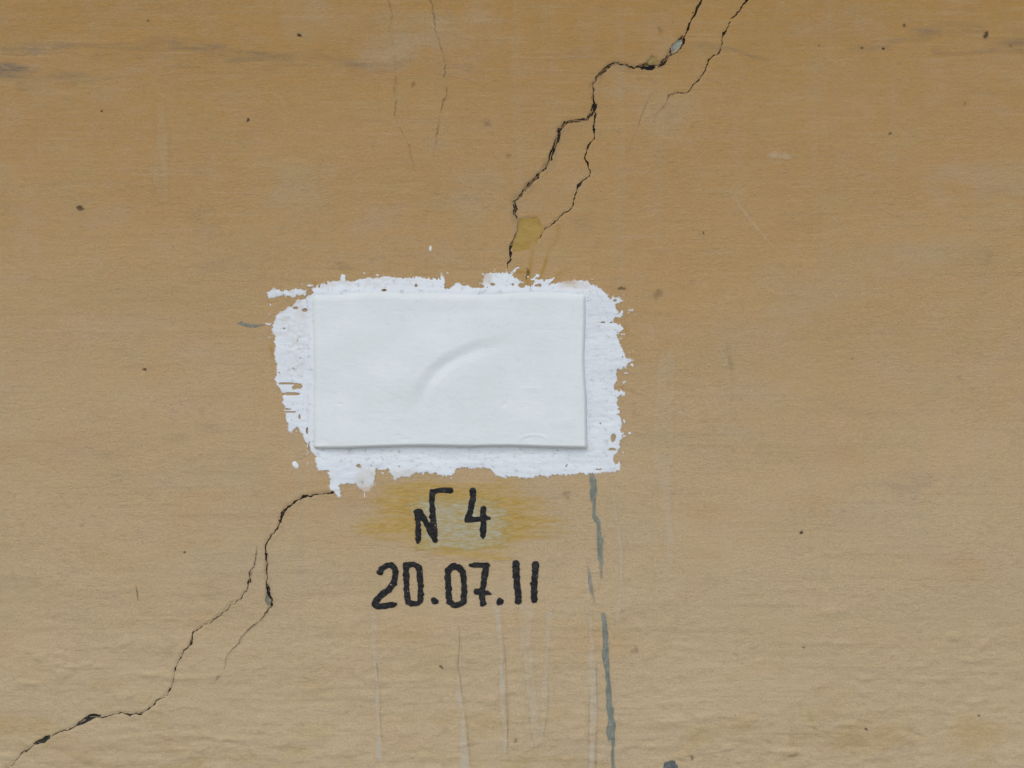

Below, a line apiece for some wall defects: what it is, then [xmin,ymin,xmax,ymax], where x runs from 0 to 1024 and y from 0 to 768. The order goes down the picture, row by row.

crack [507,0,748,268]
crack [3,490,337,768]